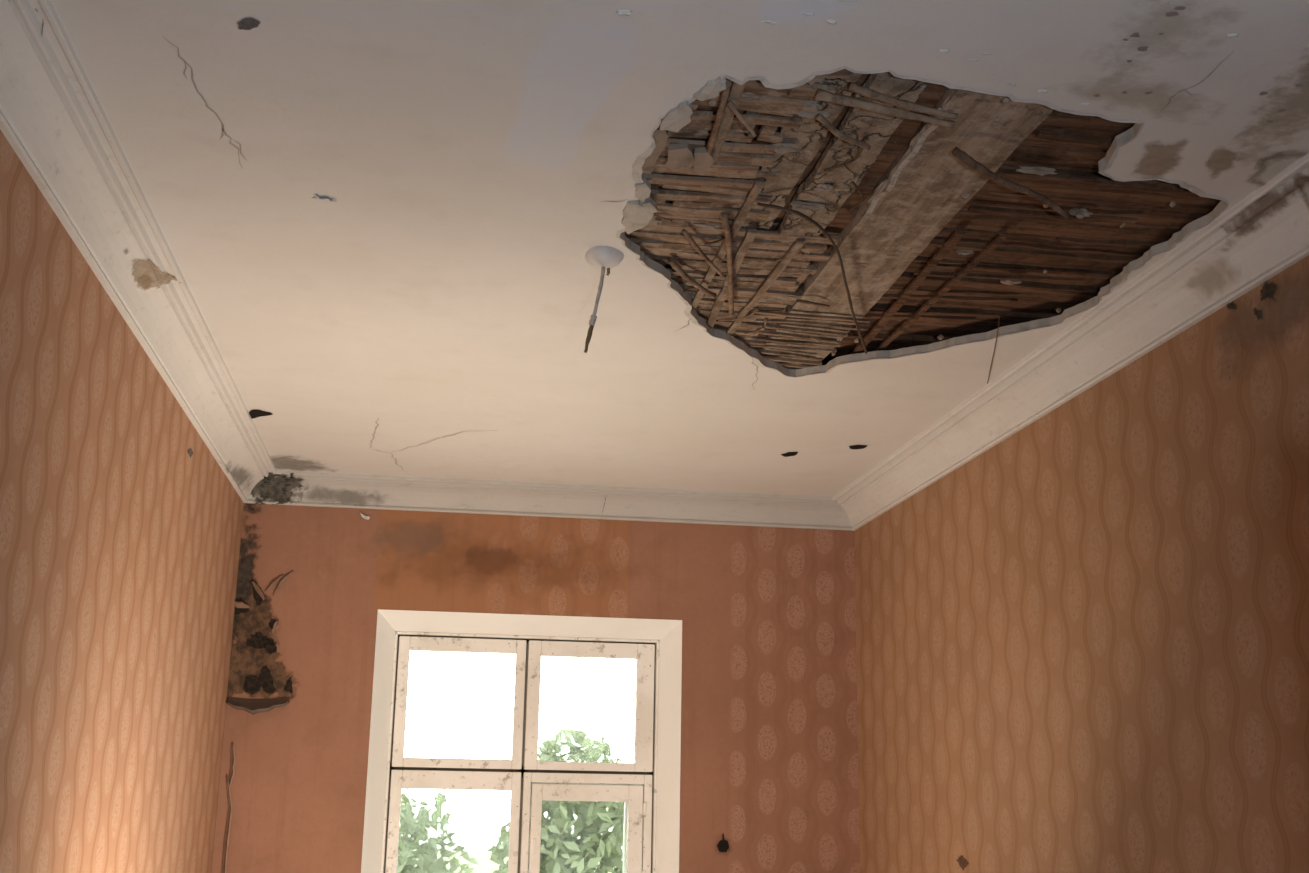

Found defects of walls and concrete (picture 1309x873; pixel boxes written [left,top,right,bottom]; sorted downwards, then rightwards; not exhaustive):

crack [163,37,247,167]
peeling [132,259,180,290]
flaking render [616,66,1229,377]
leakage [1231,179,1309,233]
flaking render [227,578,296,699]